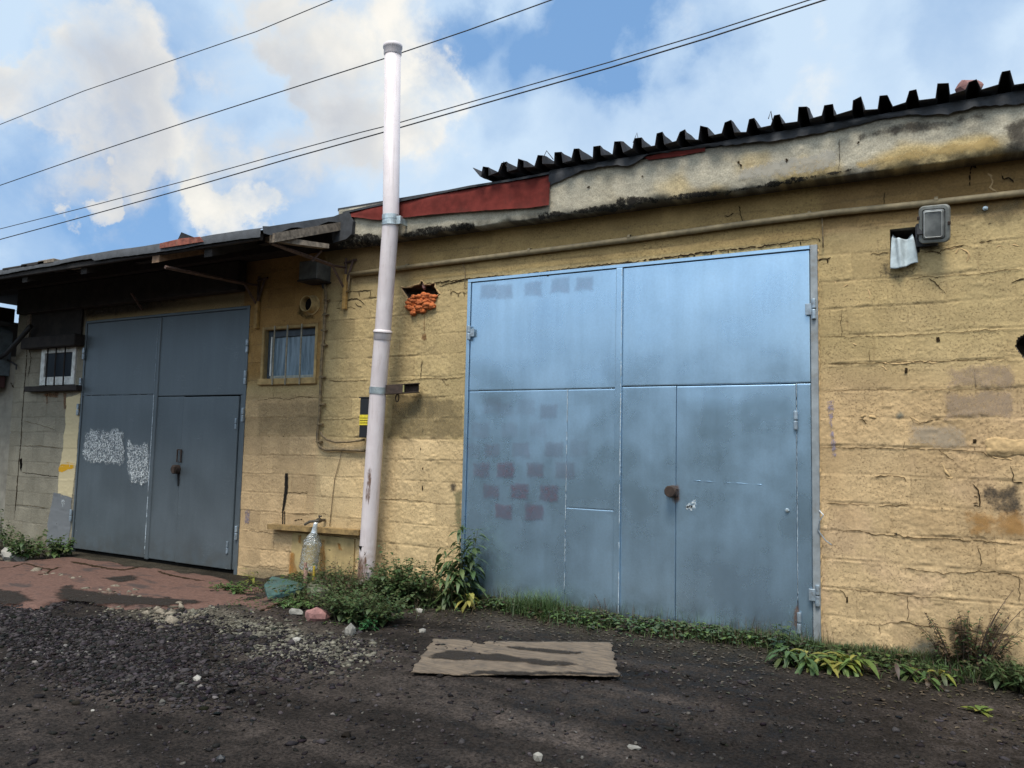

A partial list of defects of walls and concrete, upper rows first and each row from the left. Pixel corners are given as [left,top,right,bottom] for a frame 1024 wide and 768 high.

damp [859,115,982,140]
damp [1006,119,1024,150]
damp [538,168,852,221]
damp [337,233,381,249]
damp [402,223,476,237]
spalling [400,280,441,316]
crack [824,312,1012,392]
crack [823,418,1022,483]
crack [826,475,907,507]
damp [972,485,1023,533]
crack [835,530,1024,650]